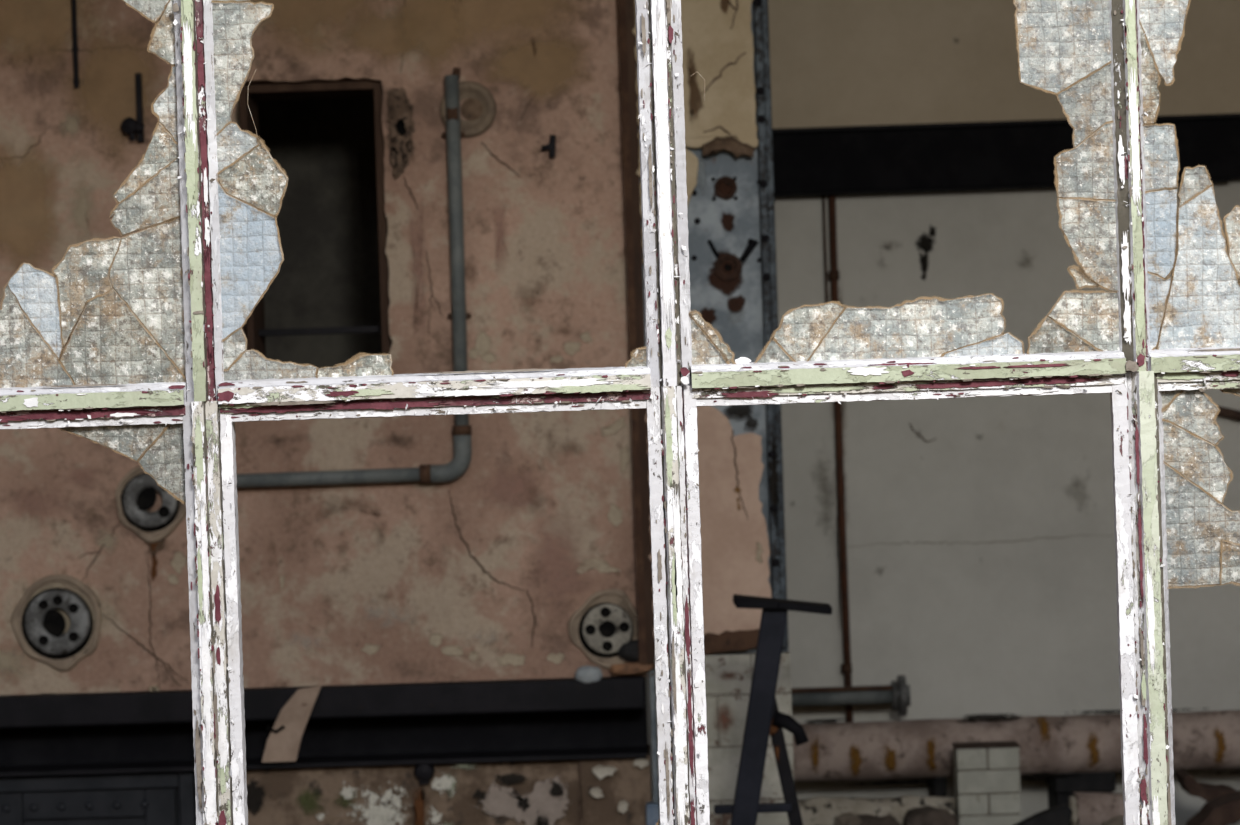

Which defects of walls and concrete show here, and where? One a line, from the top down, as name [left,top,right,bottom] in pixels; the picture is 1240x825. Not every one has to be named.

spalling [701,136,755,158]
peeling [1114,0,1157,372]
peeling [173,0,704,825]
peeling [714,355,1111,405]
crack [101,561,190,689]
crack [449,490,536,648]